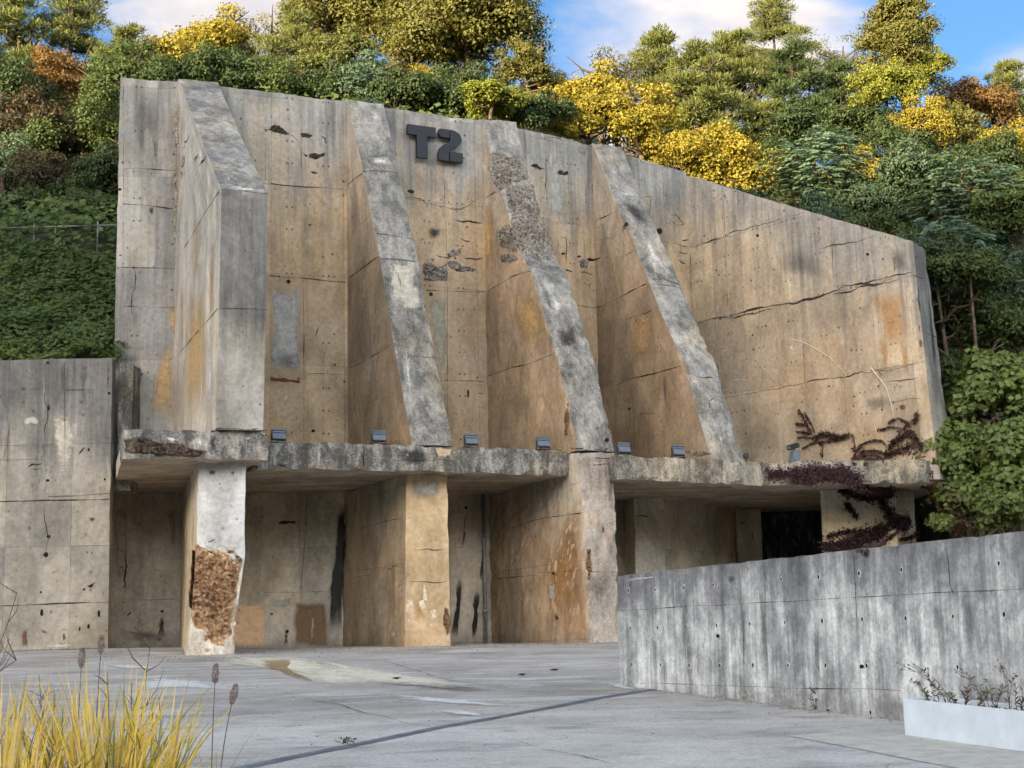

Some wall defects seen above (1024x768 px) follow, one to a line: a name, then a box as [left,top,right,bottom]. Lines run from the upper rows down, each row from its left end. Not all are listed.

spalling [265,125,312,138]
spalling [488,152,600,268]
crack [646,196,804,264]
peeling [391,248,478,308]
crack [698,272,912,323]
crack [697,350,920,419]
spalling [124,436,207,458]
spalling [188,544,242,646]
leakage [330,510,347,622]
leakage [453,583,461,633]